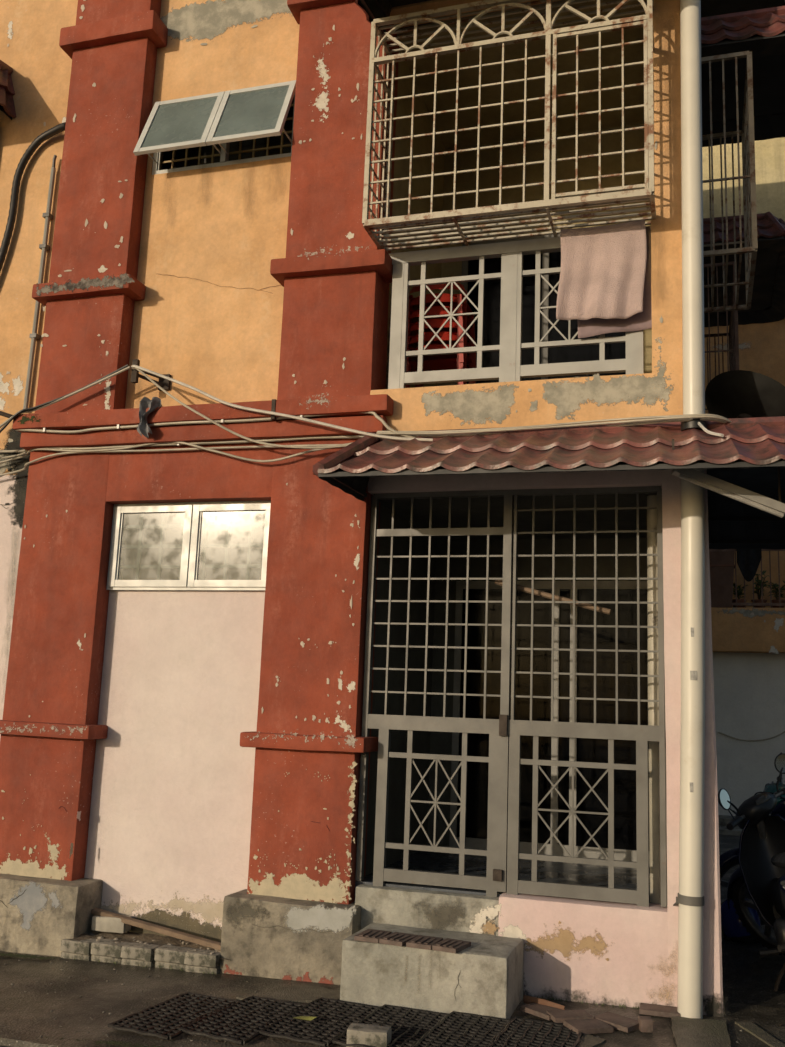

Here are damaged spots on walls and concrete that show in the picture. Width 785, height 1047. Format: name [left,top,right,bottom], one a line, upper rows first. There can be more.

peeling [160,0,291,45]
peeling [309,25,361,123]
peeling [0,371,24,410]
peeling [421,337,673,426]
peeling [0,820,73,880]
peeling [247,762,358,903]
water stain [127,899,269,942]
peeling [469,904,609,961]